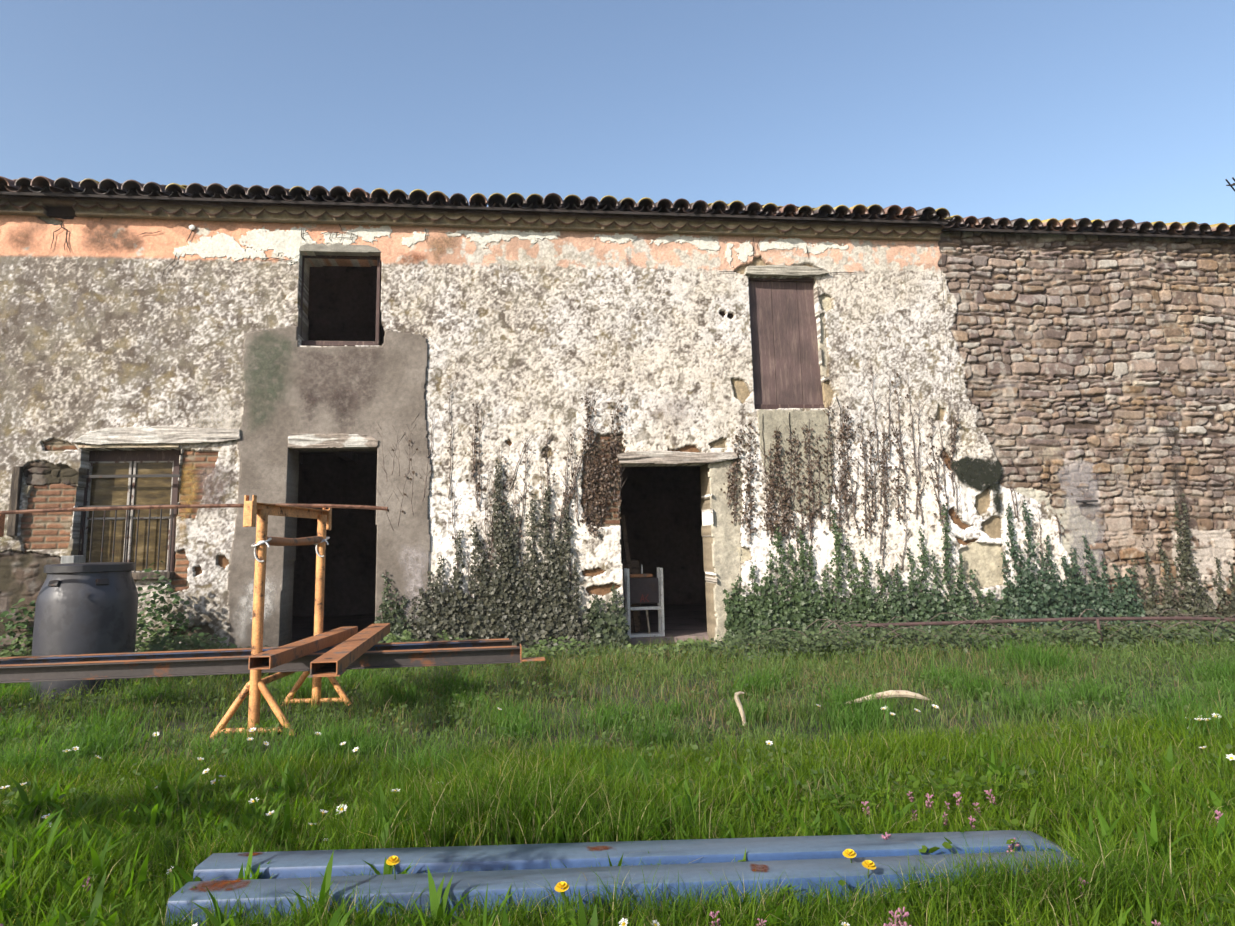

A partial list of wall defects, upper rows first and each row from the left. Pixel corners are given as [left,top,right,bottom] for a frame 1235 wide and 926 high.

crack [50,220,71,253]
peeling [173,225,429,265]
peeling [446,229,560,249]
peeling [592,233,848,279]
spalling [178,450,218,518]
spalling [580,433,625,527]
spalling [0,439,79,656]
spalling [948,489,1007,589]